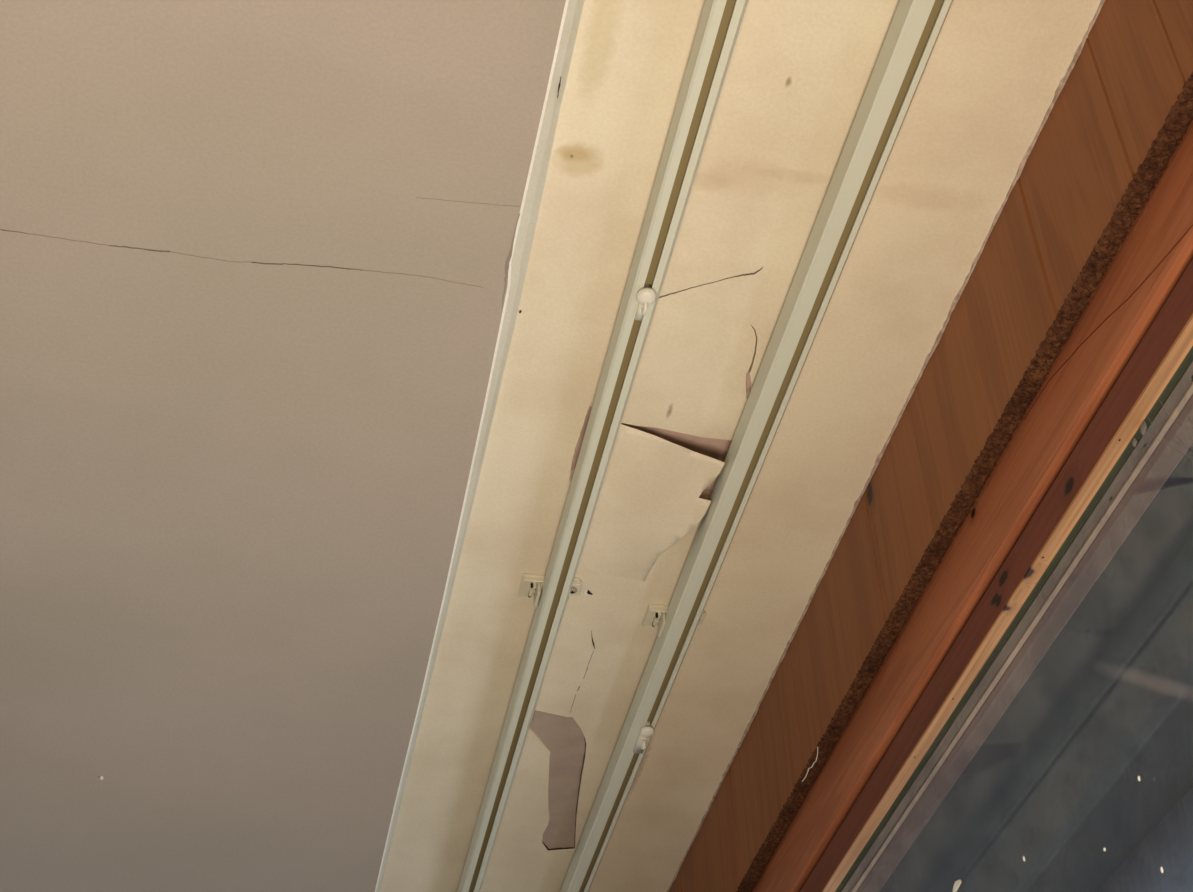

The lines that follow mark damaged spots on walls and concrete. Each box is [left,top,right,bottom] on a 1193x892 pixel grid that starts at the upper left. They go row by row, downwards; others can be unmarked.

crack [0,229,484,288]
crack [659,267,763,298]
peeling [583,423,732,581]
spalling [530,710,586,851]